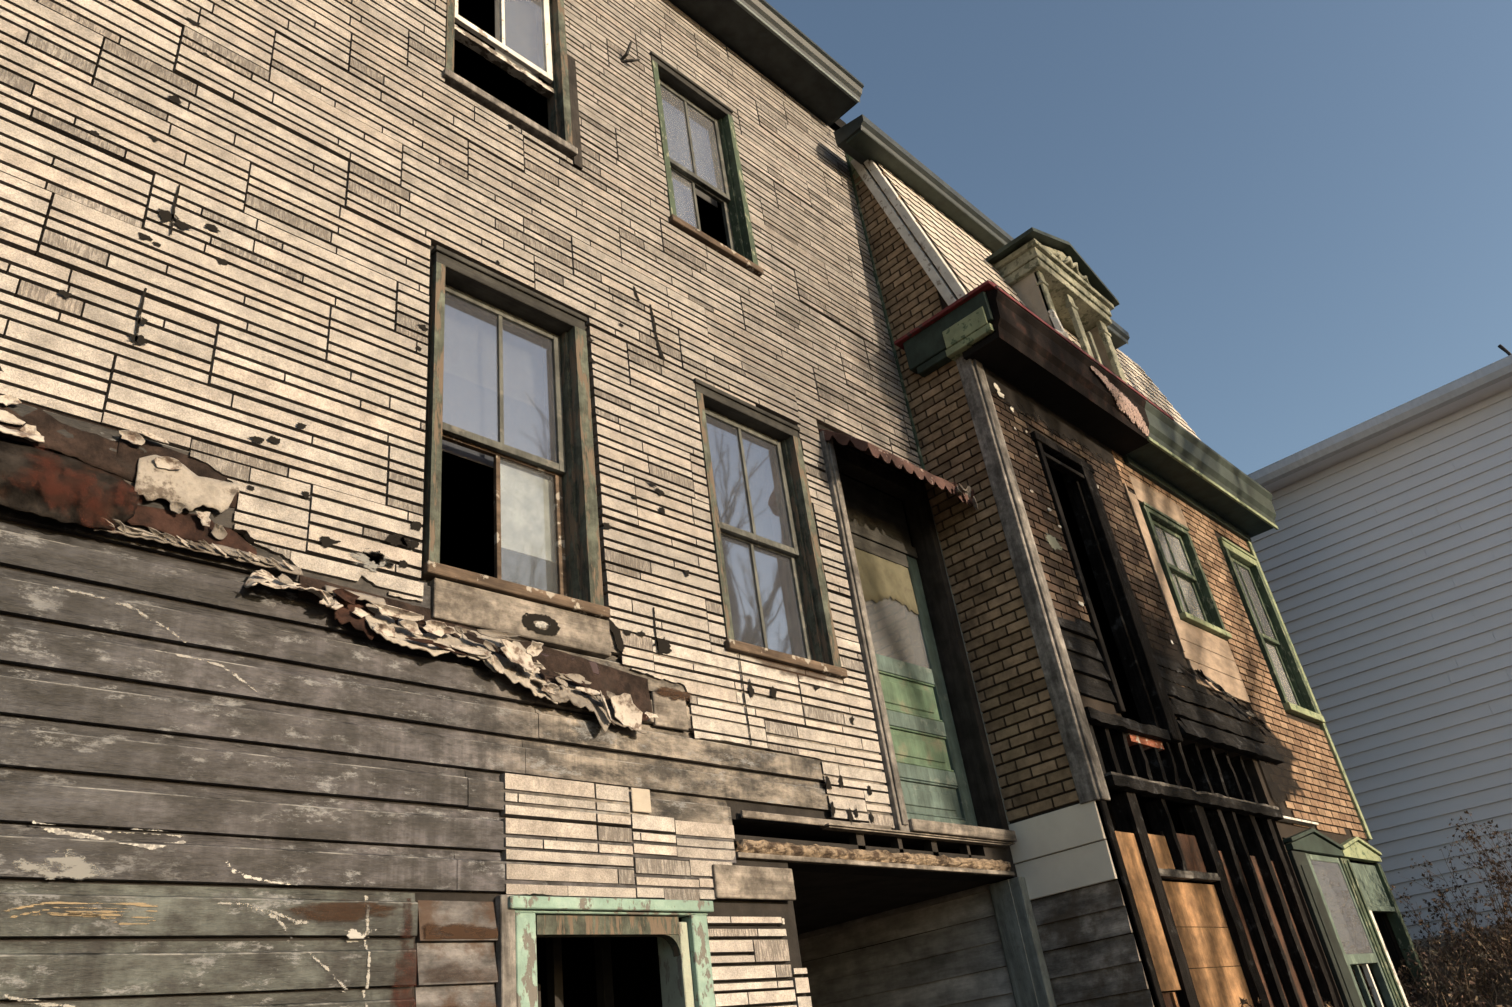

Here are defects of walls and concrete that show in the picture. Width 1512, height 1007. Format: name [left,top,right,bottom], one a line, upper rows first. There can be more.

spalling [128,317,148,344]
peeling [0,395,182,483]
spalling [249,436,280,444]
peeling [169,501,228,540]
spalling [319,536,341,548]
spalling [363,521,422,568]
peeling [249,569,659,731]
spalling [623,629,672,654]
spalling [734,839,1011,871]